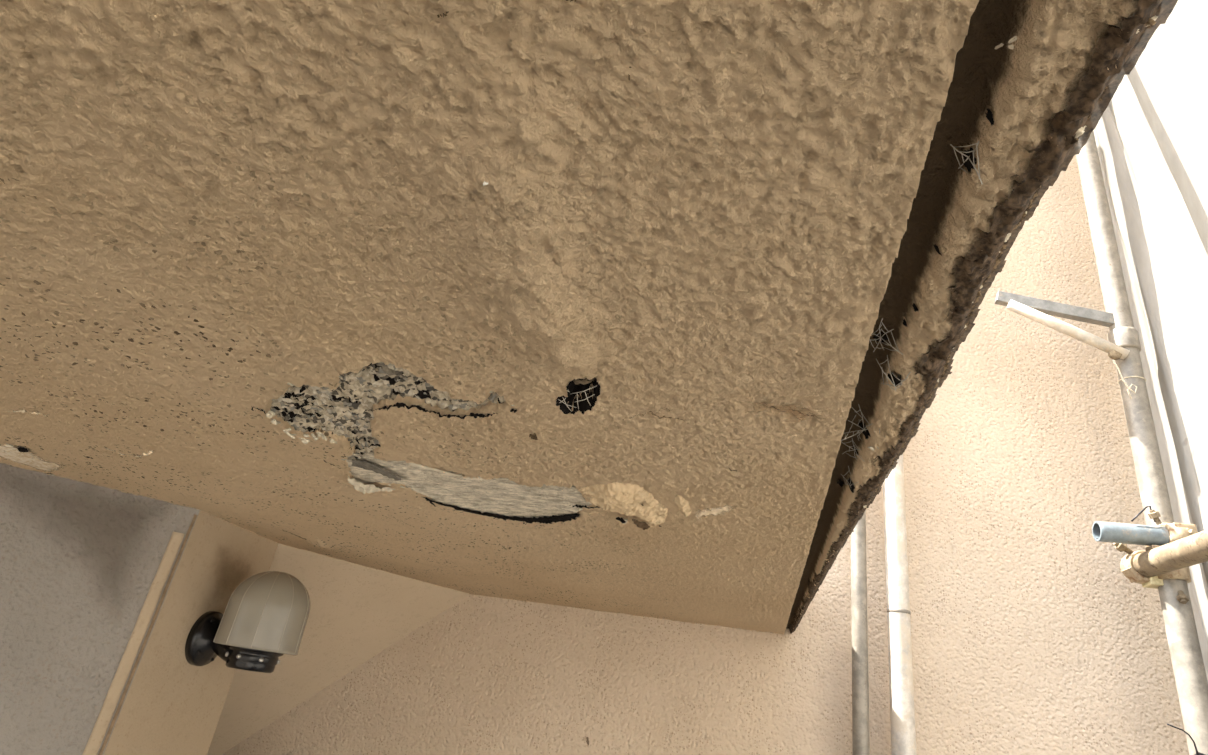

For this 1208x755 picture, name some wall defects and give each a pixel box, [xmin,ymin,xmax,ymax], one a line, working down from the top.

spalling [950,141,983,185]
spalling [1066,114,1091,146]
spalling [263,362,691,530]
spalling [830,178,1050,565]